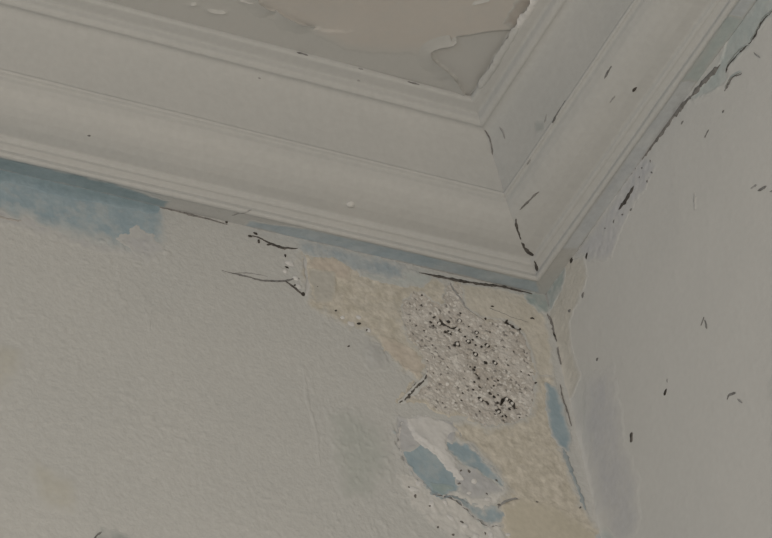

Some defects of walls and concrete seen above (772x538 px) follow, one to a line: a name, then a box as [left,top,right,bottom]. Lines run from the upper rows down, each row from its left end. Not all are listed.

peeling [417,0,538,96]
peeling [687,0,772,104]
peeling [0,157,170,265]
crack [222,270,301,294]
crack [248,232,298,250]
crack [419,272,532,321]
crack [515,192,539,271]
peeling [575,156,657,264]
spalling [244,220,586,538]